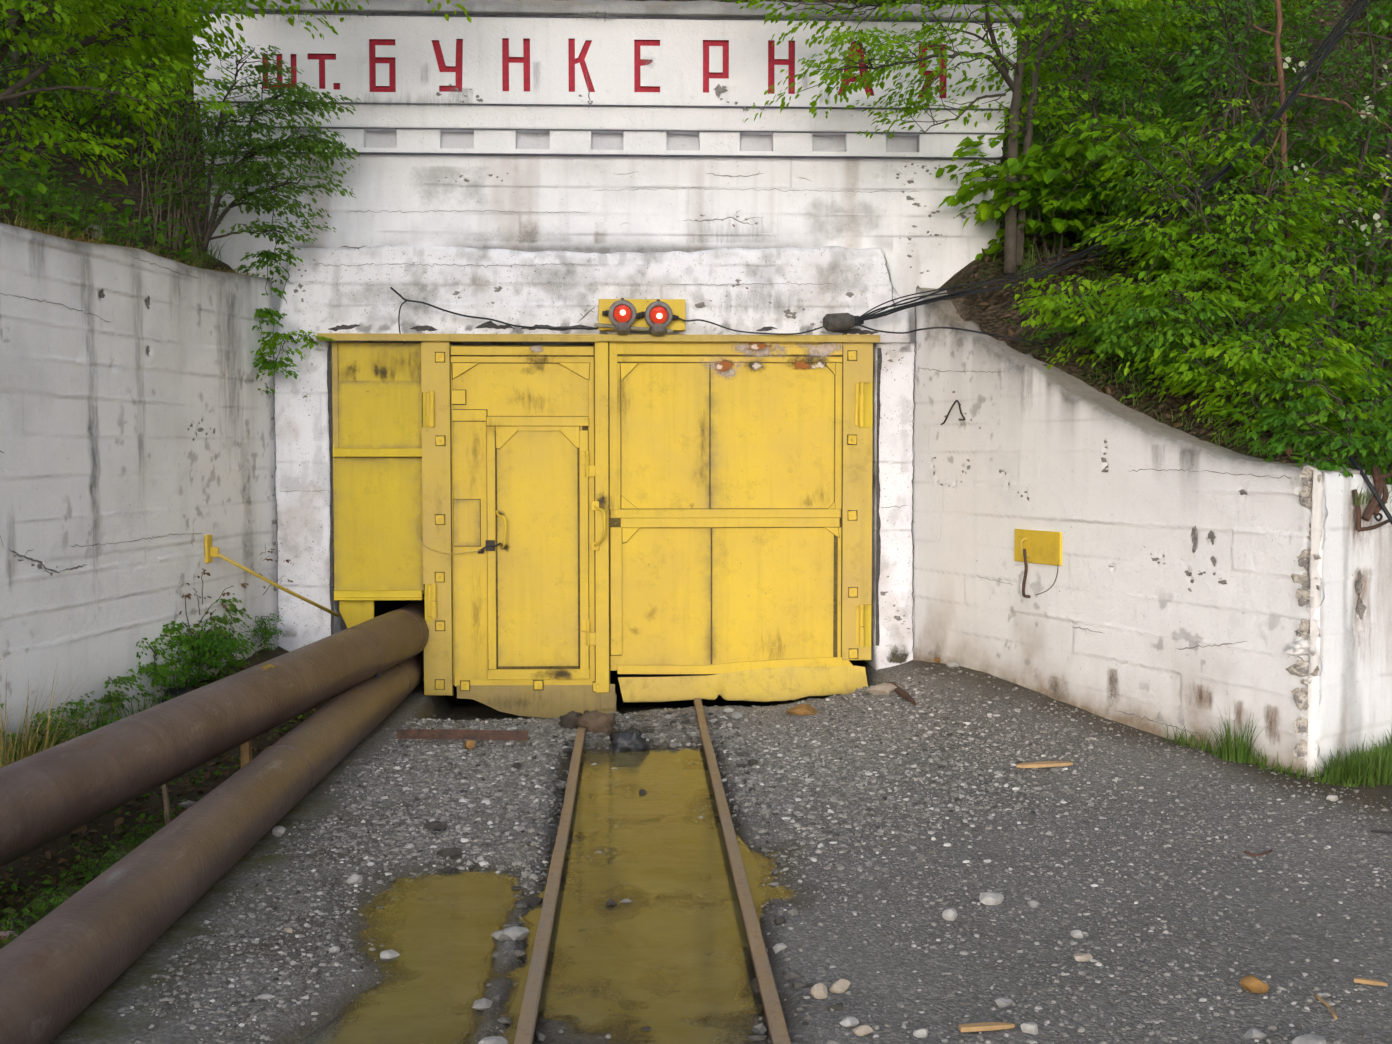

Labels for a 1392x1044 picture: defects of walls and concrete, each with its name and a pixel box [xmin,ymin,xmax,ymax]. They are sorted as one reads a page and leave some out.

spalling [756,302,910,646]
peeling [1184,525,1227,592]
spalling [1291,466,1321,642]
spalling [1286,655,1319,760]